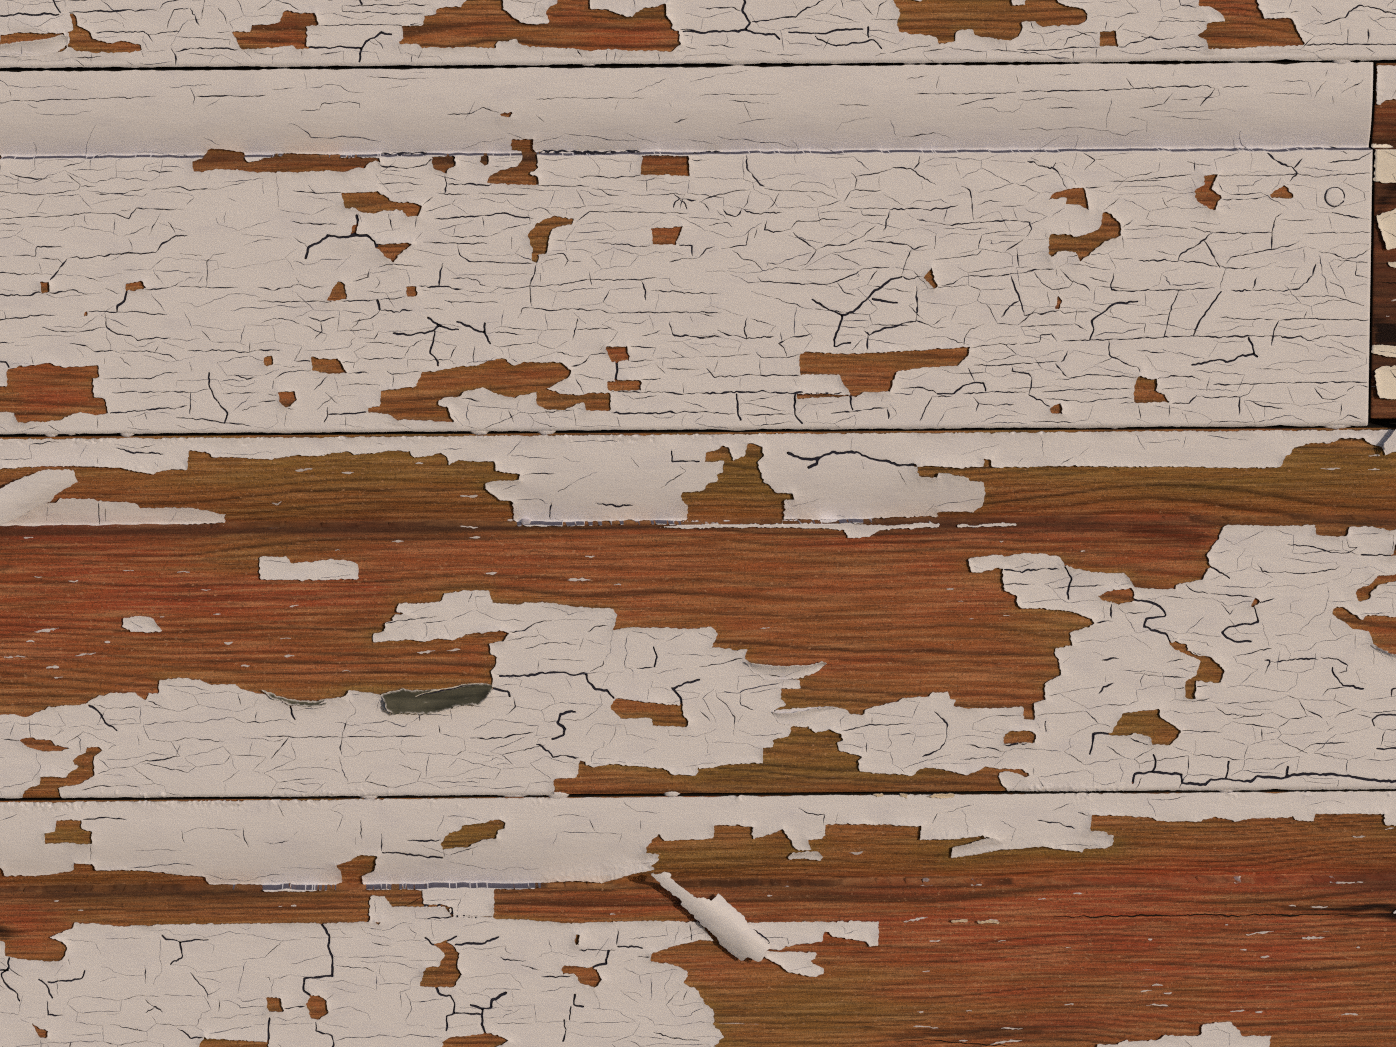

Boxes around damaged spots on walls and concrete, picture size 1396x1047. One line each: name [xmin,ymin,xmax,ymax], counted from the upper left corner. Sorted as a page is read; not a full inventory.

peeling [232,10,319,50]
peeling [399,0,681,52]
peeling [893,0,1087,44]
peeling [1198,0,1305,49]
crack [0,0,1396,521]
peeling [0,63,1396,803]
crack [840,530,1396,846]
crack [0,594,804,1047]
peeling [441,819,505,850]
peeling [0,855,454,962]
peeling [420,940,462,988]
peeling [484,813,1396,1047]